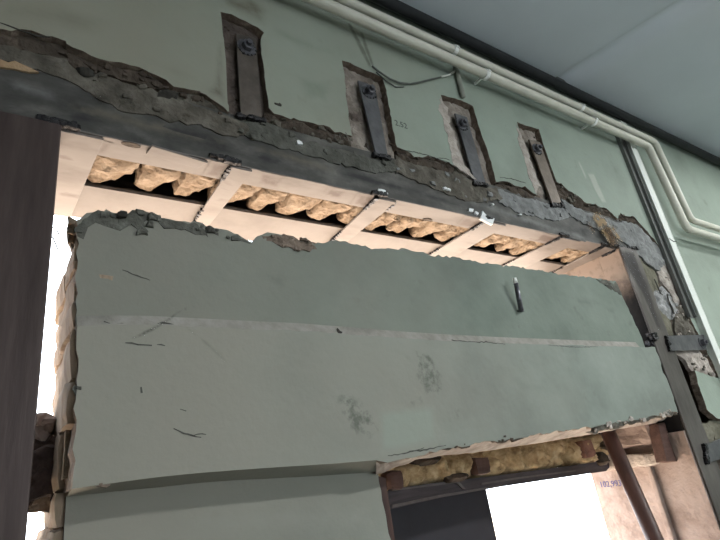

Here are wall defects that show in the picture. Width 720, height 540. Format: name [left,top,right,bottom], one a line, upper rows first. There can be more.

spalling [76,63,224,115]
spalling [87,155,220,199]
spalling [260,112,353,155]
spalling [389,98,477,186]
spalling [483,125,541,202]
spalling [227,184,363,224]
spalling [365,212,469,242]
spalling [555,185,640,232]
spalling [596,279,622,295]
damp [400,346,448,408]
damp [318,386,379,444]